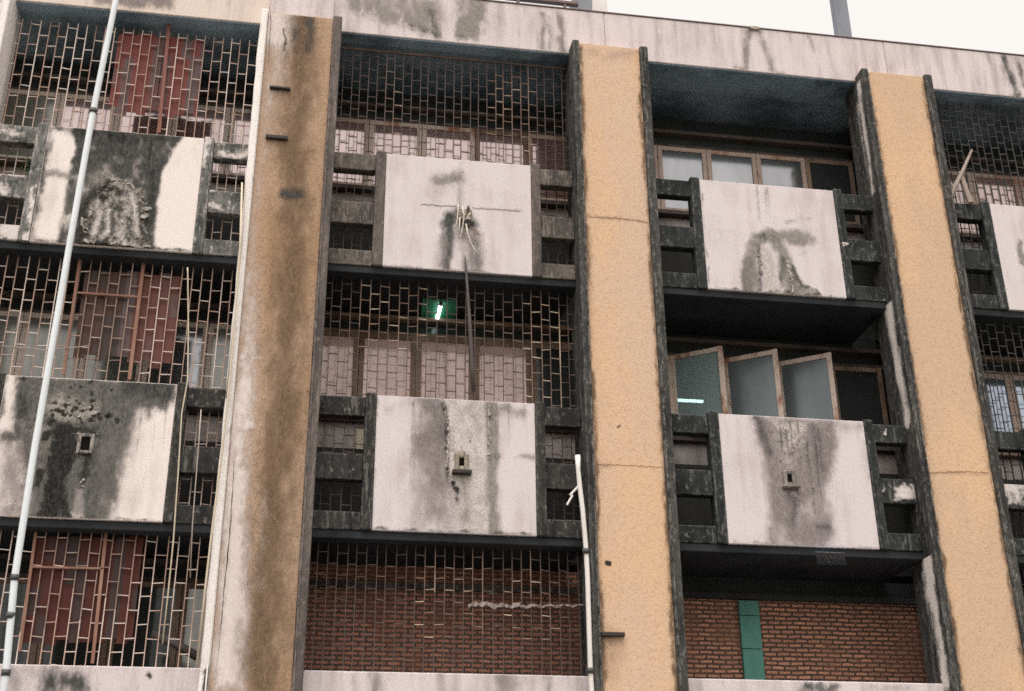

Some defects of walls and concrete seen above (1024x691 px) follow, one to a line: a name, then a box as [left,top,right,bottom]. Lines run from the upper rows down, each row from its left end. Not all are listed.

water stain [267,13,313,102]
water stain [456,0,485,40]
water stain [31,126,182,250]
water stain [440,209,482,270]
spalling [454,203,480,256]
water stain [742,229,821,295]
flaking render [35,380,120,454]
water stain [1,376,174,519]
water stain [211,273,257,691]
water stain [416,398,451,515]
water stain [486,401,523,534]
water stain [754,416,836,546]